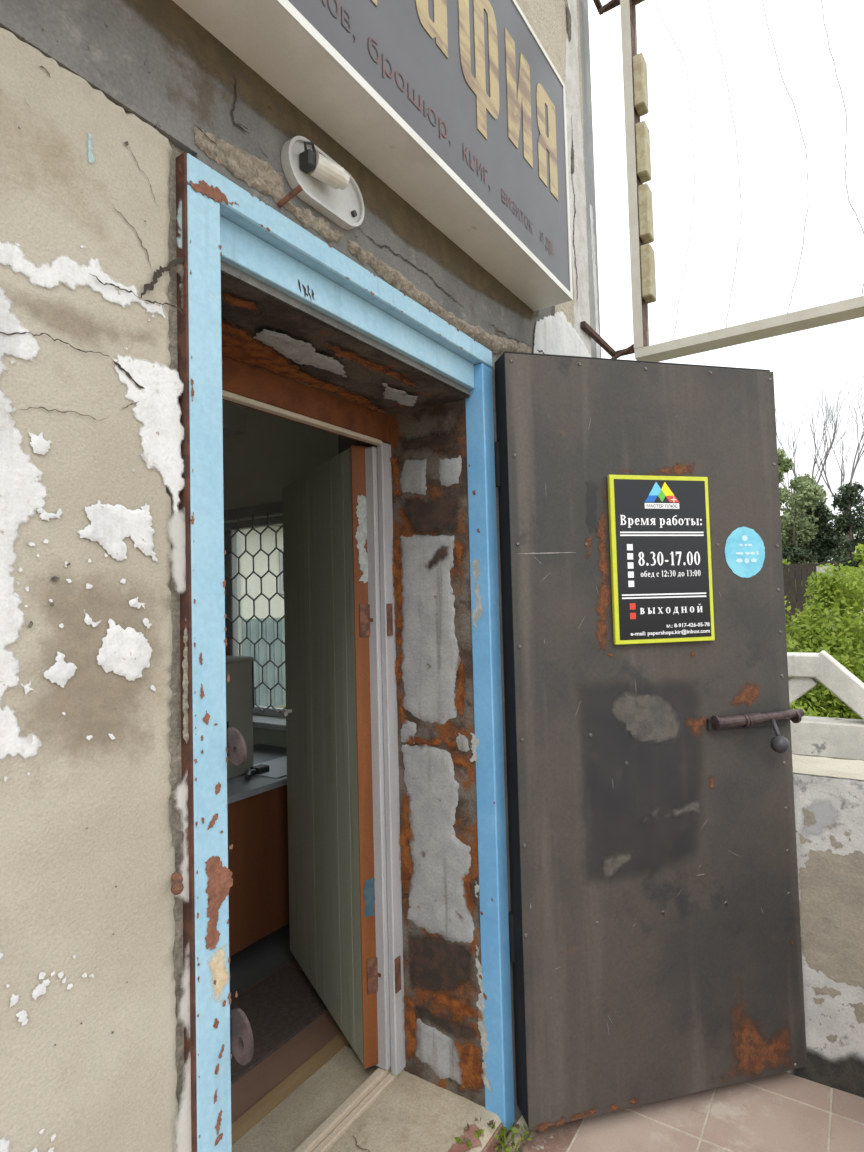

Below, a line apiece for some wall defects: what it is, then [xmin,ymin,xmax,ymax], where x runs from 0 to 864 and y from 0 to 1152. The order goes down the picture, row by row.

crack [0,332,145,420]
spalling [253,329,347,377]
spalling [382,383,418,407]
peeling [28,429,51,455]
peeling [78,500,158,562]
rust [585,514,613,657]
peeling [44,652,77,688]
peeling [84,597,156,692]
rust [205,856,233,1000]
peeling [798,807,864,1024]
peeling [475,945,492,1094]
rust [730,1005,791,1075]